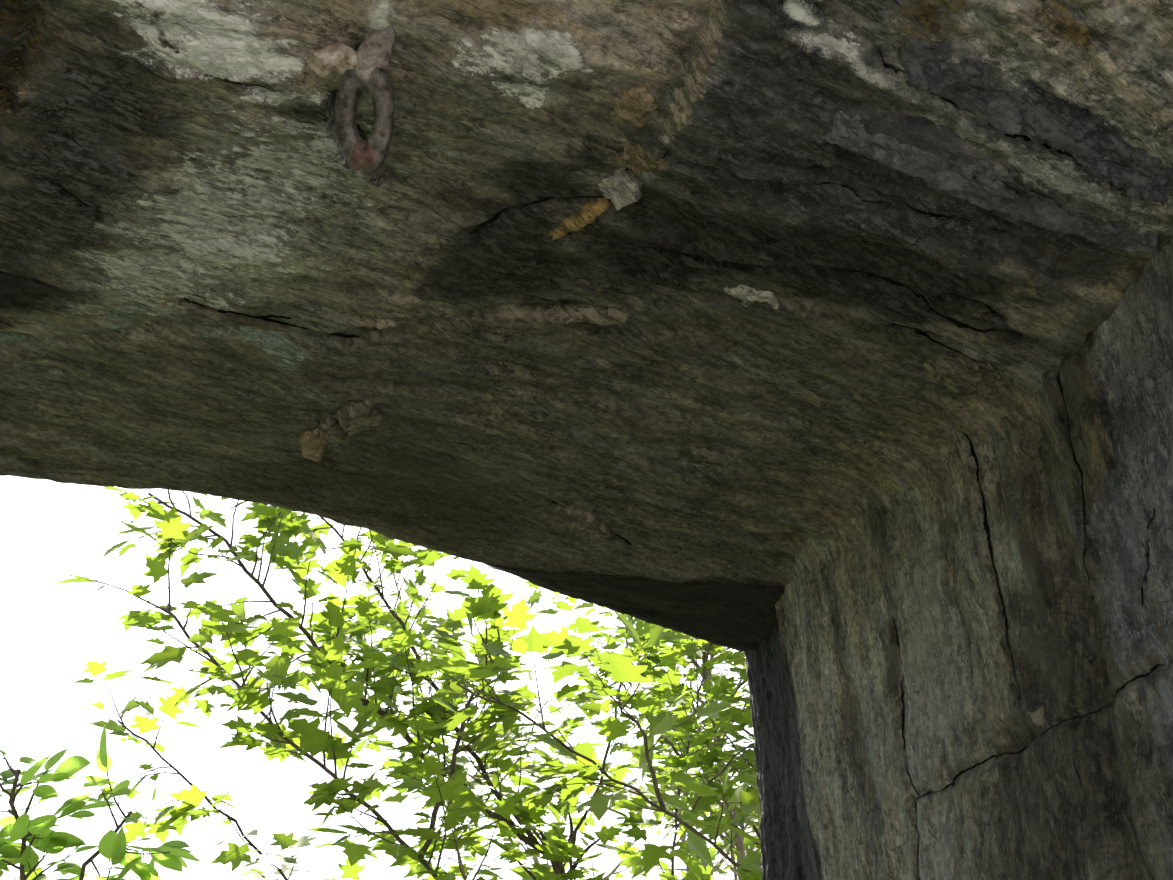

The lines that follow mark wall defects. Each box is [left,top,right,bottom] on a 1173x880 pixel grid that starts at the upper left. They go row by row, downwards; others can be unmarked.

damp [367,0,392,30]
damp [452,22,597,109]
crack [878,49,906,74]
crack [929,92,1140,194]
crack [184,298,359,338]
crack [1056,372,1094,601]
crack [963,432,1020,698]
crack [1141,509,1155,606]
crack [894,619,1173,880]